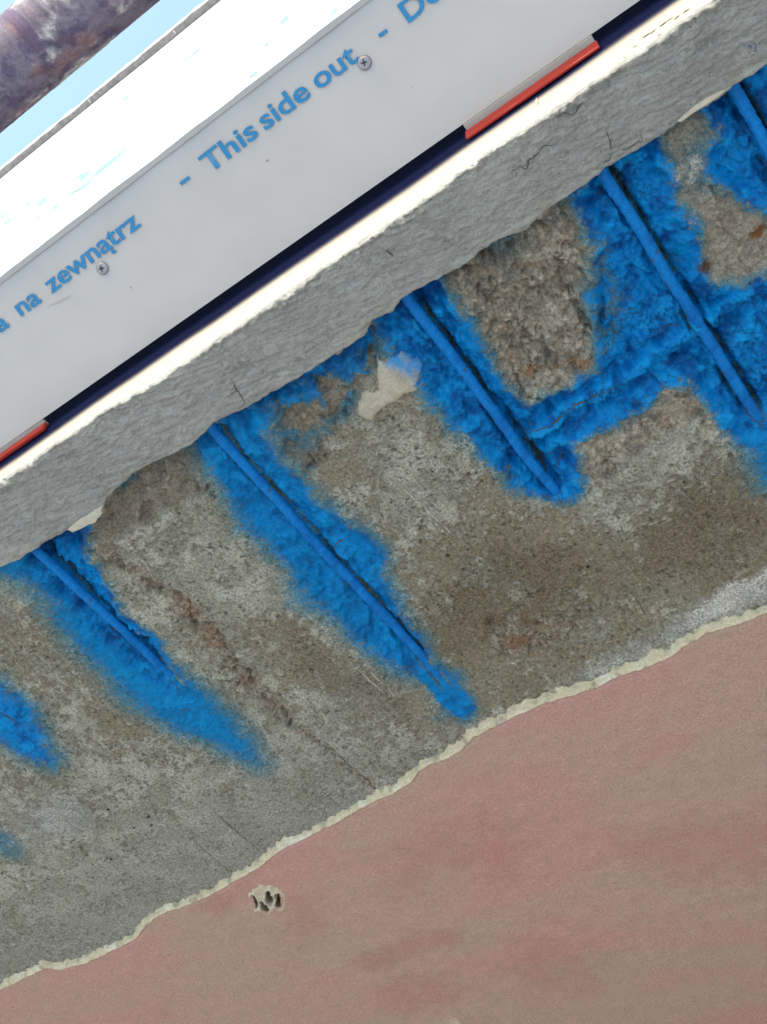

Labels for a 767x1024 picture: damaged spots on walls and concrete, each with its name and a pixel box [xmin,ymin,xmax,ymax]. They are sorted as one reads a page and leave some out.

crack [508,103,587,175]
spalling [0,64,767,775]
flaking render [0,605,767,990]